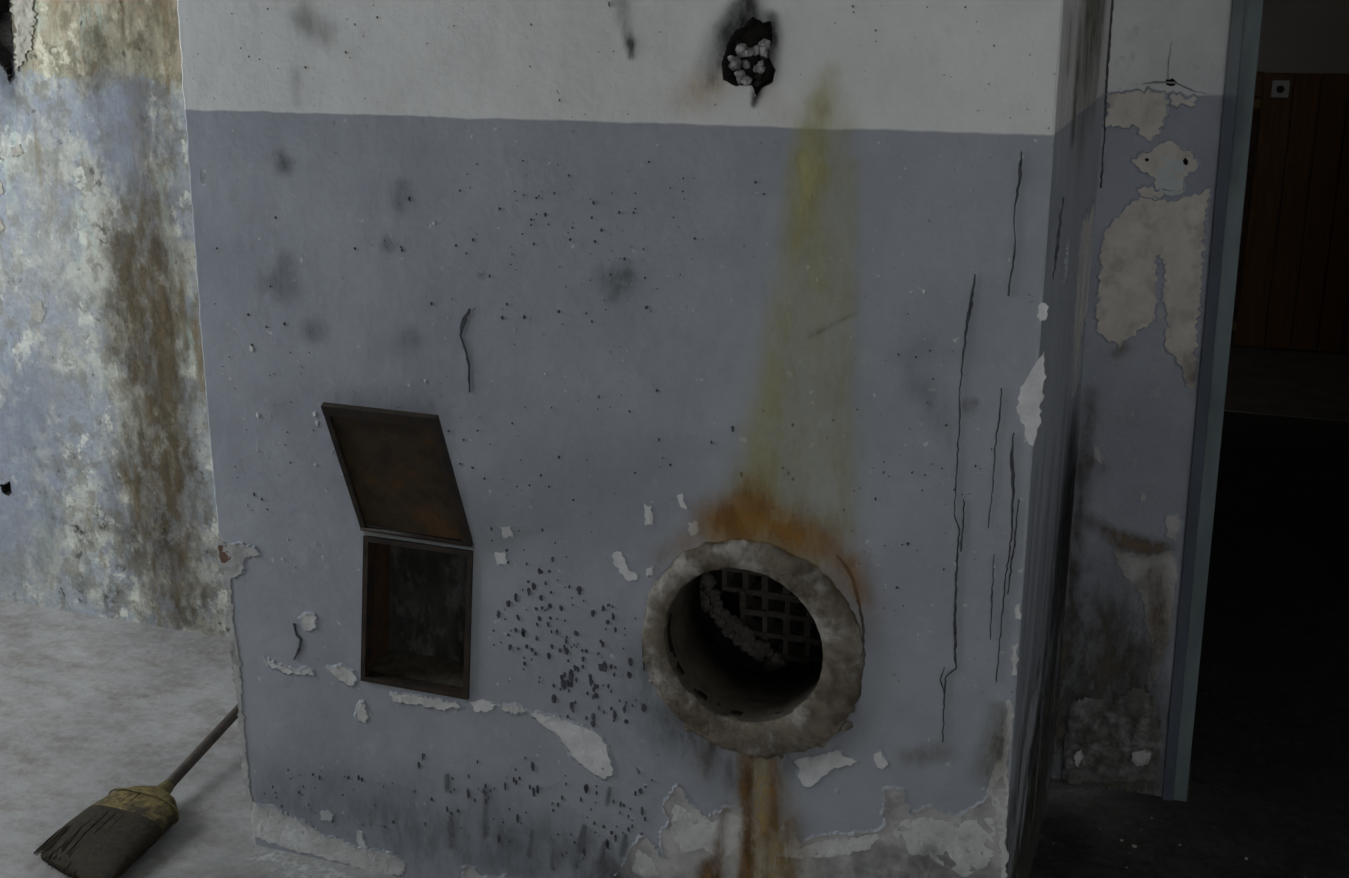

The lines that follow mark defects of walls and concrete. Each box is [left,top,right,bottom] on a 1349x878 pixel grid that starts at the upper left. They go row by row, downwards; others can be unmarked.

hole [0,0,15,85]
hole [722,19,776,95]
crack [1008,151,1022,296]
crack [1052,197,1064,279]
peeling [1093,86,1213,389]
damp [105,93,206,628]
crack [460,309,470,393]
crack [940,274,1020,743]
damp [225,847,357,878]
rust [739,755,784,878]
peeling [607,699,1015,878]
damp [1007,558,1161,878]